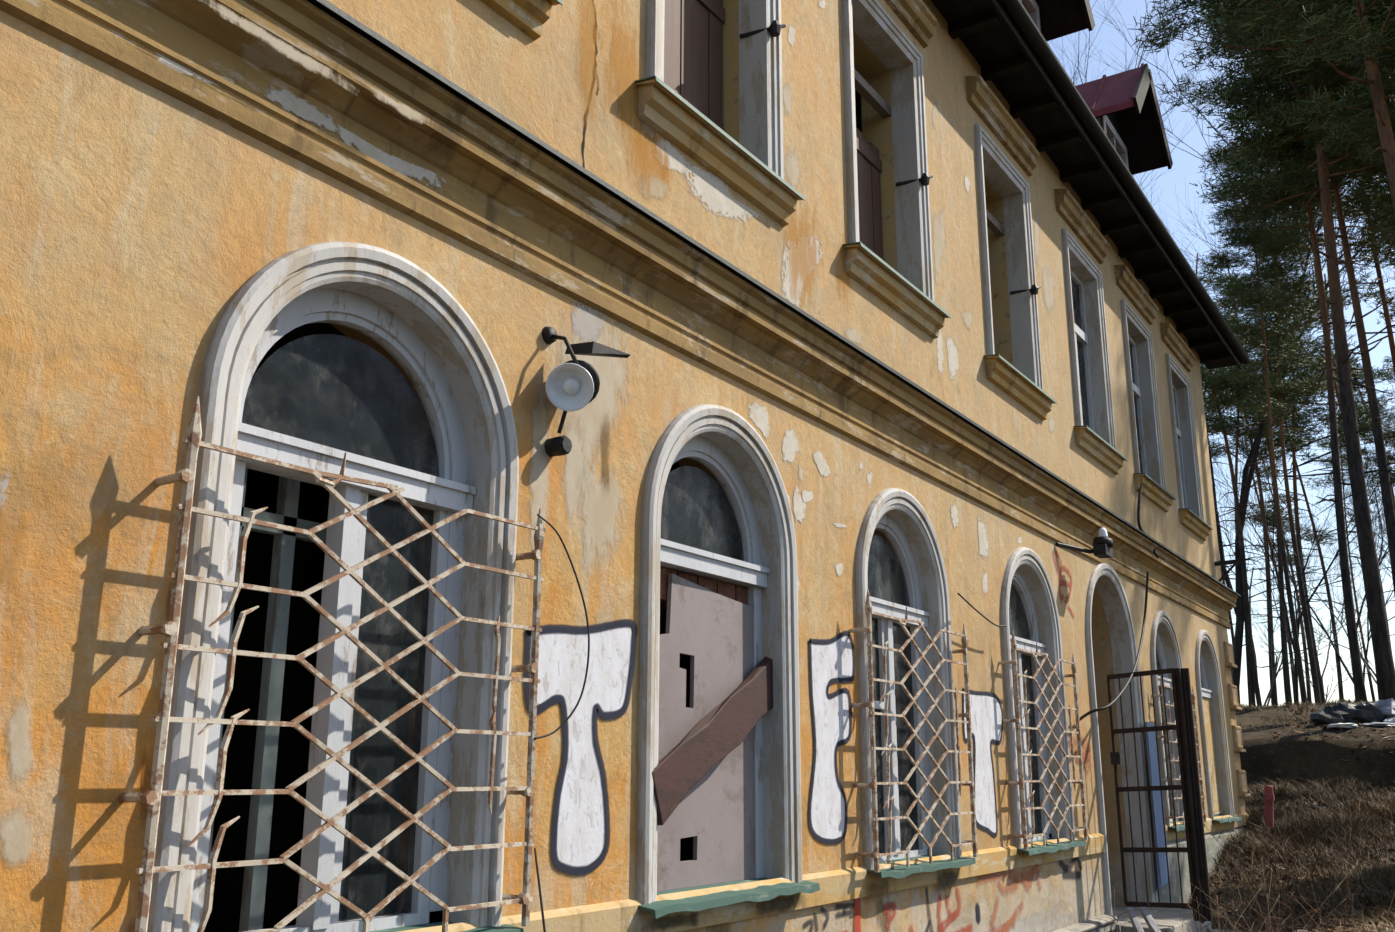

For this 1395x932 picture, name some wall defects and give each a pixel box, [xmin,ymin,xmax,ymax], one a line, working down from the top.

spalling [156,53,234,85]
spalling [210,1,347,88]
crack [582,0,599,168]
spalling [264,84,445,188]
peeling [641,121,759,222]
peeling [0,475,10,509]
peeling [747,401,831,523]
peeling [8,702,35,777]
peeling [1,807,31,864]